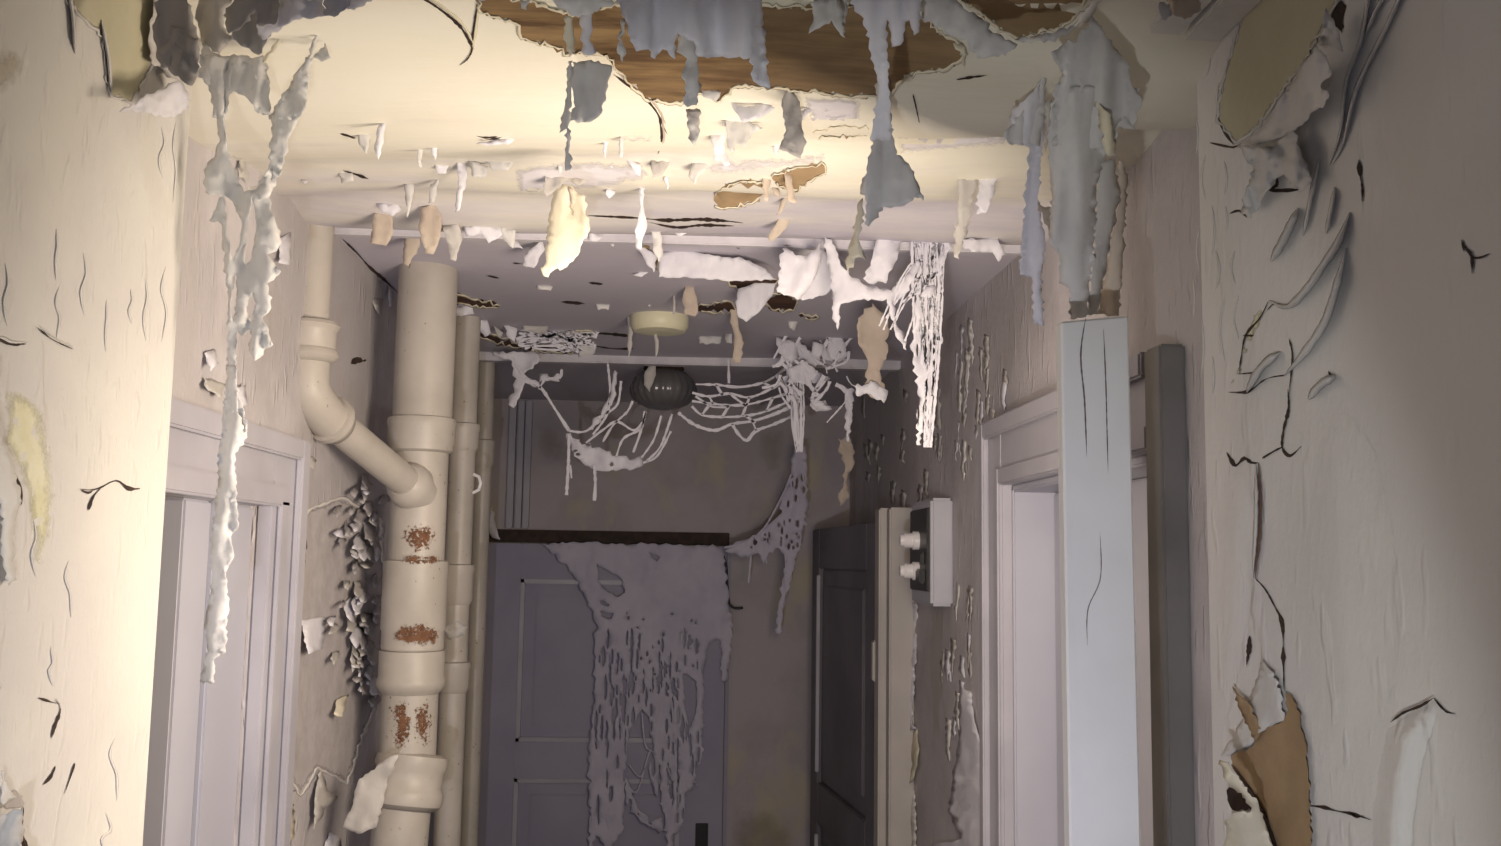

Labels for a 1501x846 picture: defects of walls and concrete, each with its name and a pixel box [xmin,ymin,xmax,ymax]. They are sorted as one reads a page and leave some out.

crack [0,325,74,349]
peeling [65,0,372,684]
peeling [290,474,390,846]
rust [386,697,432,749]
rust [393,623,438,646]
rust [402,526,440,564]
peeling [370,0,1142,418]
peeling [838,318,1008,508]
peeling [1211,0,1346,218]
crack [1226,302,1334,687]
crack [1356,160,1364,201]
crack [1461,240,1489,271]